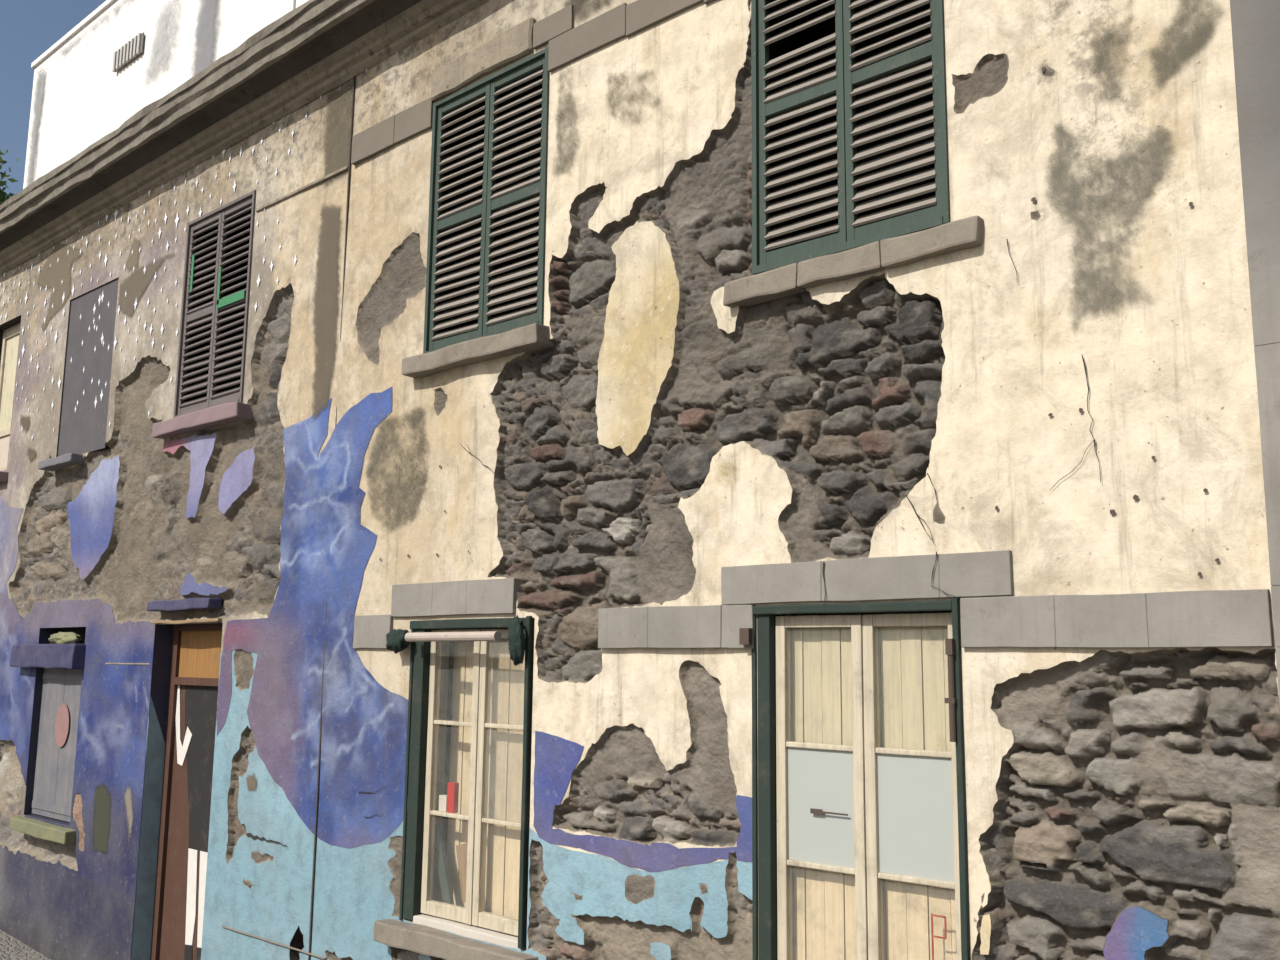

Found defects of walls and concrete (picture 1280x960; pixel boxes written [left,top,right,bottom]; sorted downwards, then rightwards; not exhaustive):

spalling [951,53,1009,114]
damp [1151,0,1219,82]
damp [1047,124,1171,323]
spalling [355,232,426,366]
spalling [488,0,946,683]
crack [1050,355,1101,490]
spalling [0,740,133,871]
spalling [226,725,257,864]
spalling [388,836,403,917]
spalling [528,660,753,960]
spalling [972,647,1280,960]
spalling [391,947,445,960]